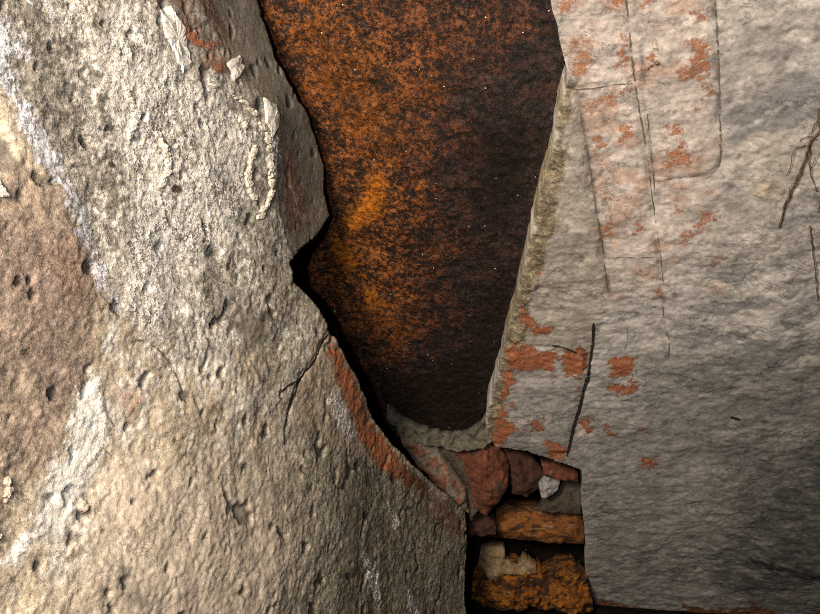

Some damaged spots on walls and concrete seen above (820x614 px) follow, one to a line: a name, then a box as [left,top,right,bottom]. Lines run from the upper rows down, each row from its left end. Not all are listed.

peeling [571,34,593,77]
peeling [616,33,631,67]
peeling [676,38,717,97]
peeling [662,123,699,169]
rust [340,172,391,235]
peeling [681,211,718,242]
crack [280,330,329,445]
spalling [489,306,590,447]
crack [552,323,595,456]
spalling [606,354,640,396]
leakage [697,454,820,596]
rust [471,551,639,614]